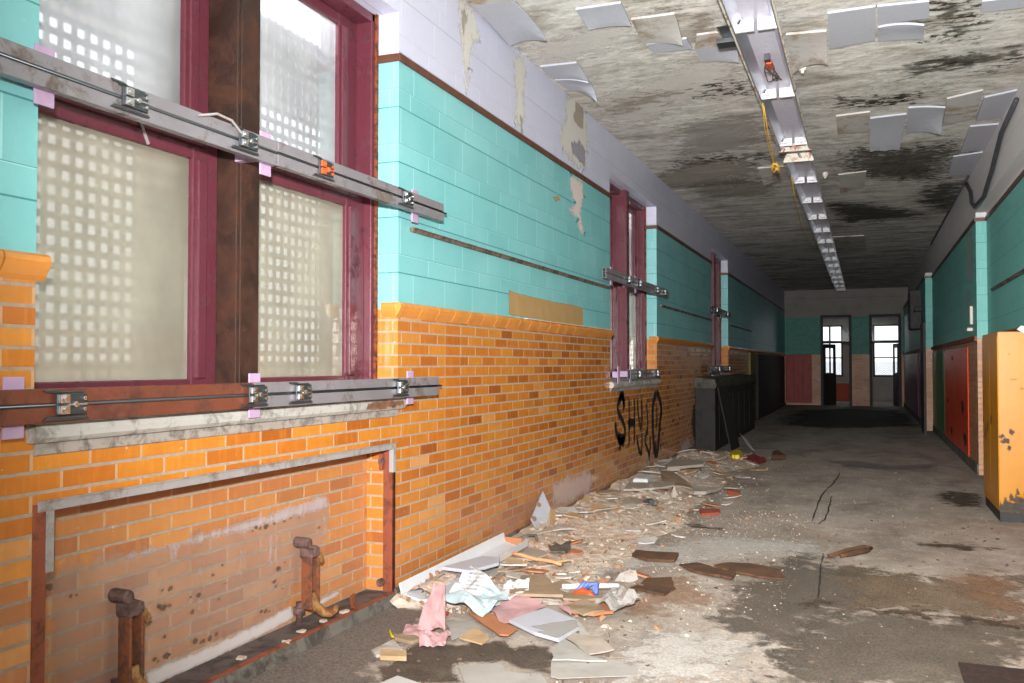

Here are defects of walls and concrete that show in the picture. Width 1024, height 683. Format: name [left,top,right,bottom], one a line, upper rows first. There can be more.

peeling [458,0,481,96]
flaking render [513,26,639,133]
water stain [612,79,755,115]
water stain [813,0,1024,111]
flaking render [554,60,742,238]
water stain [659,151,785,197]
water stain [825,135,978,225]
water stain [189,497,327,542]
crack [812,473,840,524]
crack [816,554,824,597]